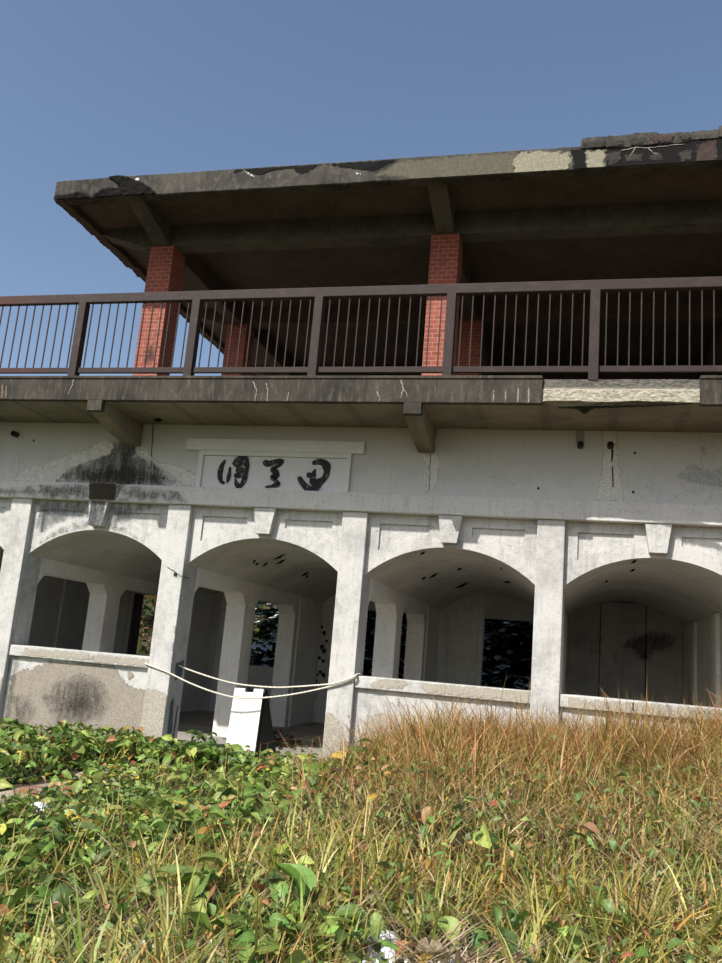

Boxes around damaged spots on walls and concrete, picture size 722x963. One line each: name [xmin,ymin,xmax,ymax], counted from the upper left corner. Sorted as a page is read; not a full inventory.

peeling [233,133,722,182]
crack [622,144,684,158]
damp [0,438,196,539]